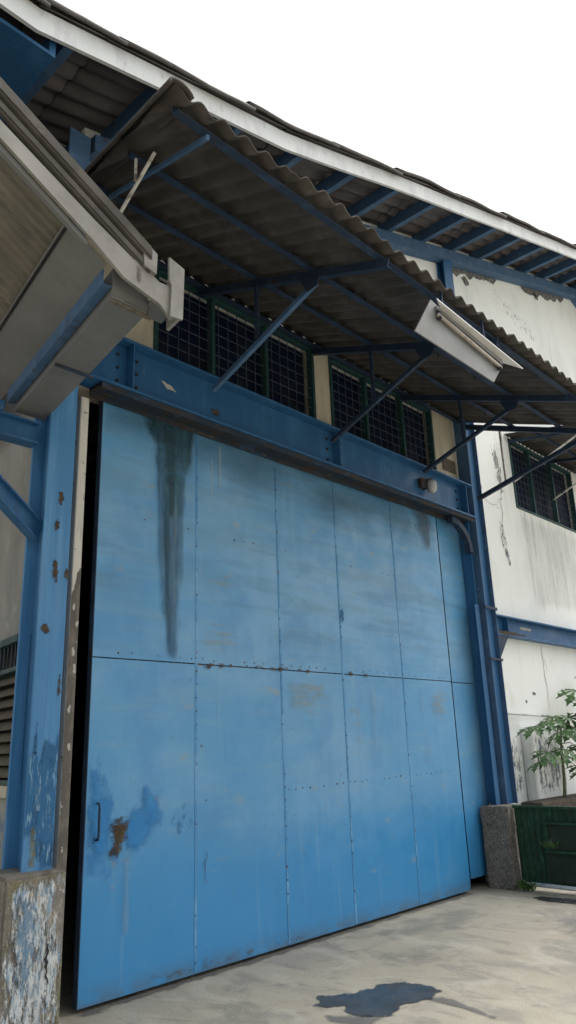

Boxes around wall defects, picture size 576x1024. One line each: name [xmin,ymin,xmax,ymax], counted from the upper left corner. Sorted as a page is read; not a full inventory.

rust [52,560,69,582]
water stain [148,418,194,657]
peeling [0,569,81,1024]
rust [109,816,128,858]